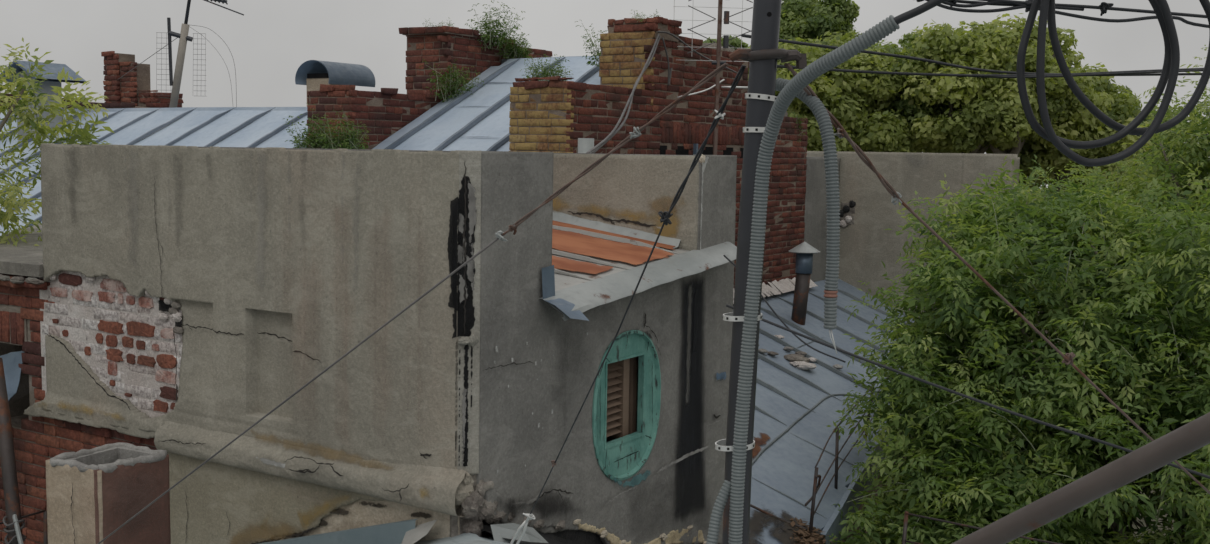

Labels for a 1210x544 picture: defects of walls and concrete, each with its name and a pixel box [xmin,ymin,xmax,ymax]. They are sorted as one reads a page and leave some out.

crack [568,211,655,227]
corrosion [552,220,675,274]
spalling [0,262,184,418]
crack [180,323,319,361]
peeling [256,162,507,544]
crack [286,456,343,476]
spalling [573,519,707,544]